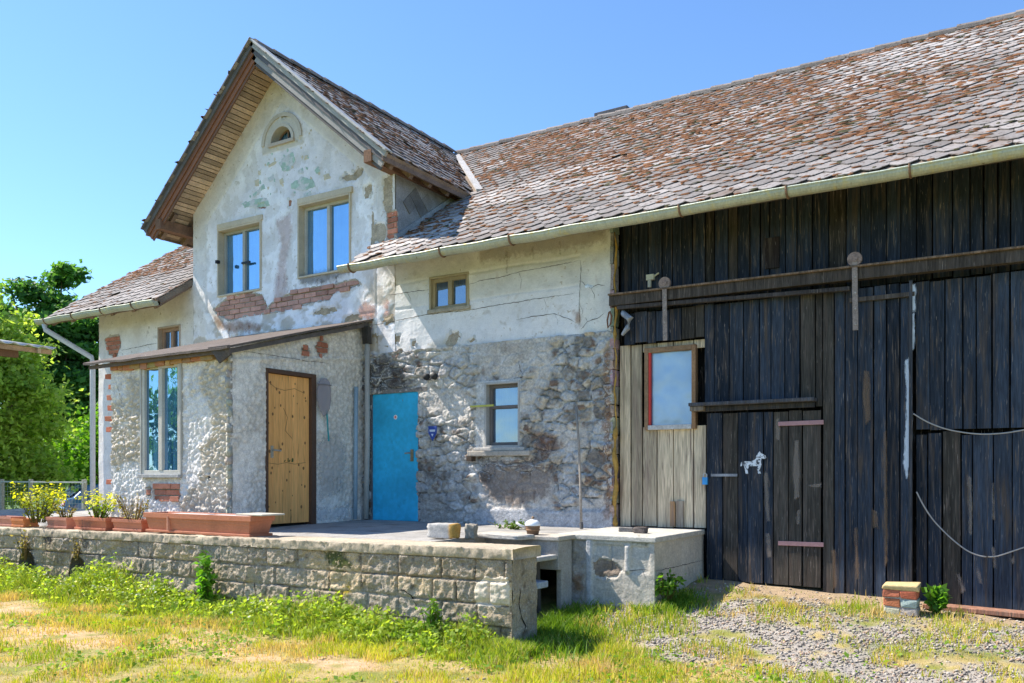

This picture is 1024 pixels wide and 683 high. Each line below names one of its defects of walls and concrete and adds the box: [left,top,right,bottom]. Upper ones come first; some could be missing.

peeling [242,129,398,250]
flaking render [213,278,363,323]
crack [374,260,605,329]
flaking render [104,334,121,358]
flaking render [301,336,330,358]
spalling [593,555,621,582]